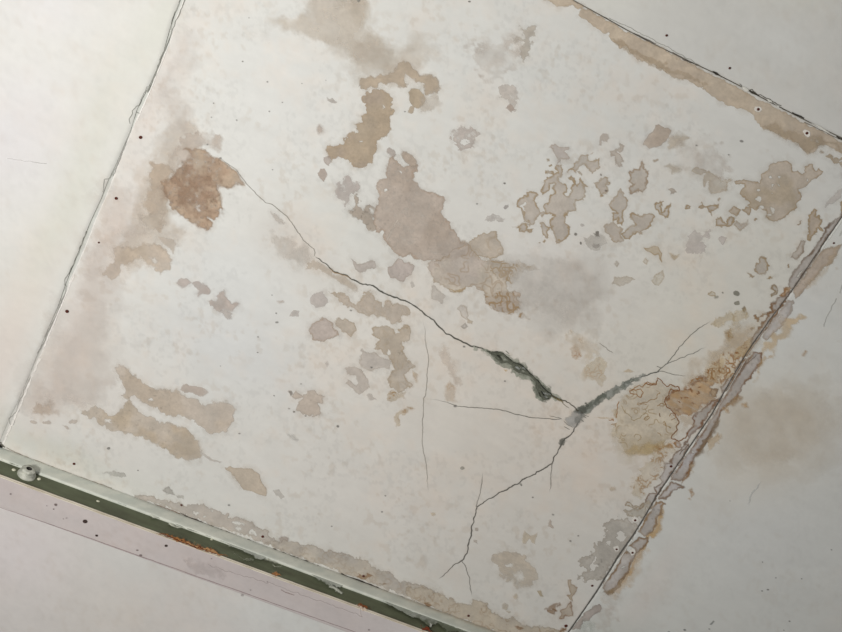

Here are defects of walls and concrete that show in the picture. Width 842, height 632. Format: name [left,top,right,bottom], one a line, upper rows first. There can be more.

leakage [102,237,174,280]
crack [225,162,489,353]
crack [422,324,706,593]
leakage [609,378,688,494]
crack [568,217,842,632]
peeling [578,212,842,595]
leakage [690,347,747,384]
rust [160,533,227,556]
peeling [385,601,467,632]